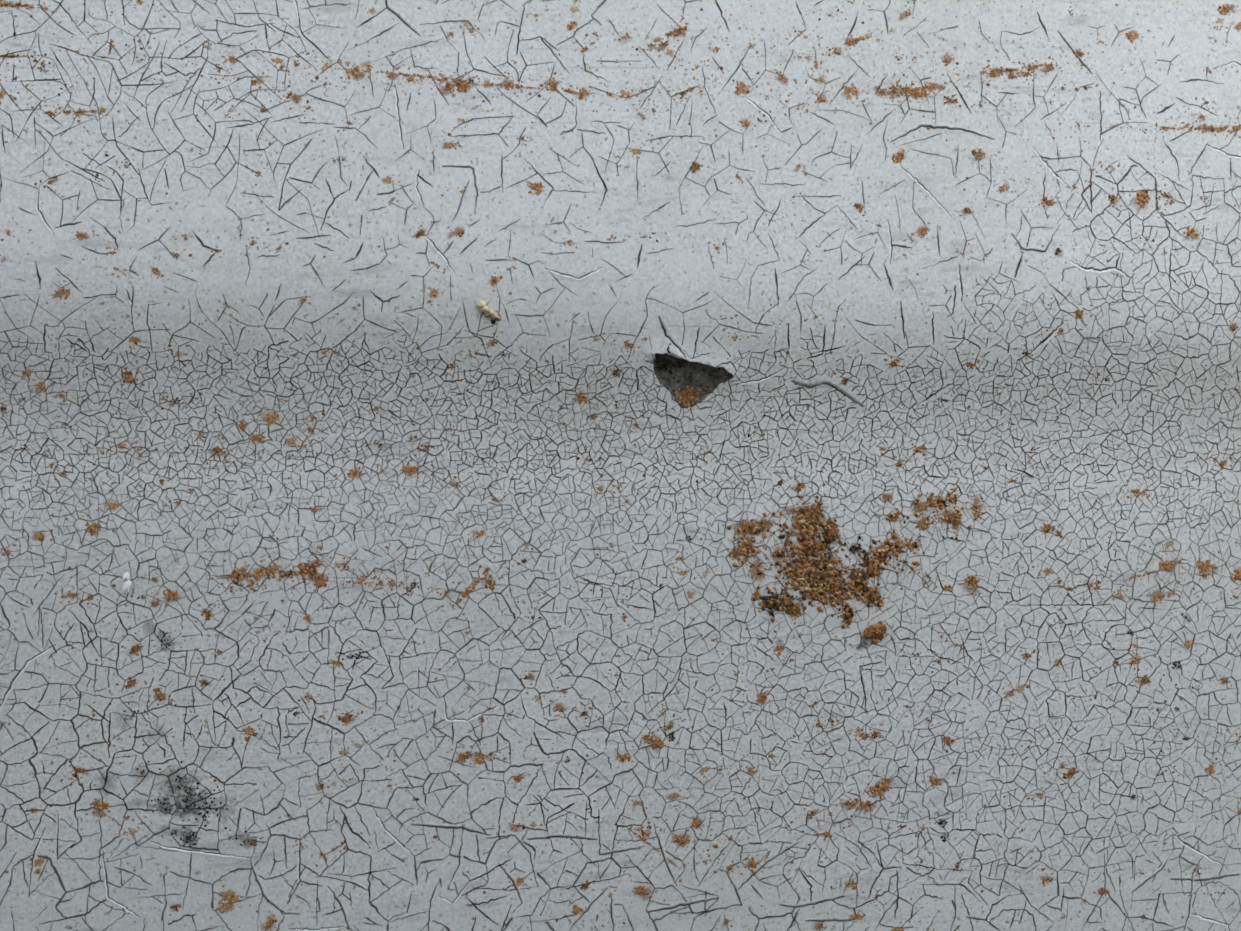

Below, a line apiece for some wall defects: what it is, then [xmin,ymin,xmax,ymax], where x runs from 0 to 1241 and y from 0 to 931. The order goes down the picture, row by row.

crack [0,103,170,298]
rust [0,0,1241,291]
crack [165,0,1241,407]
spalling [653,345,734,409]
crack [0,577,100,721]
crack [166,673,316,761]
rust [19,500,545,852]
rust [244,772,359,883]
crack [381,648,566,746]
rust [520,644,635,727]
rust [665,440,1241,759]
rust [1035,756,1093,781]